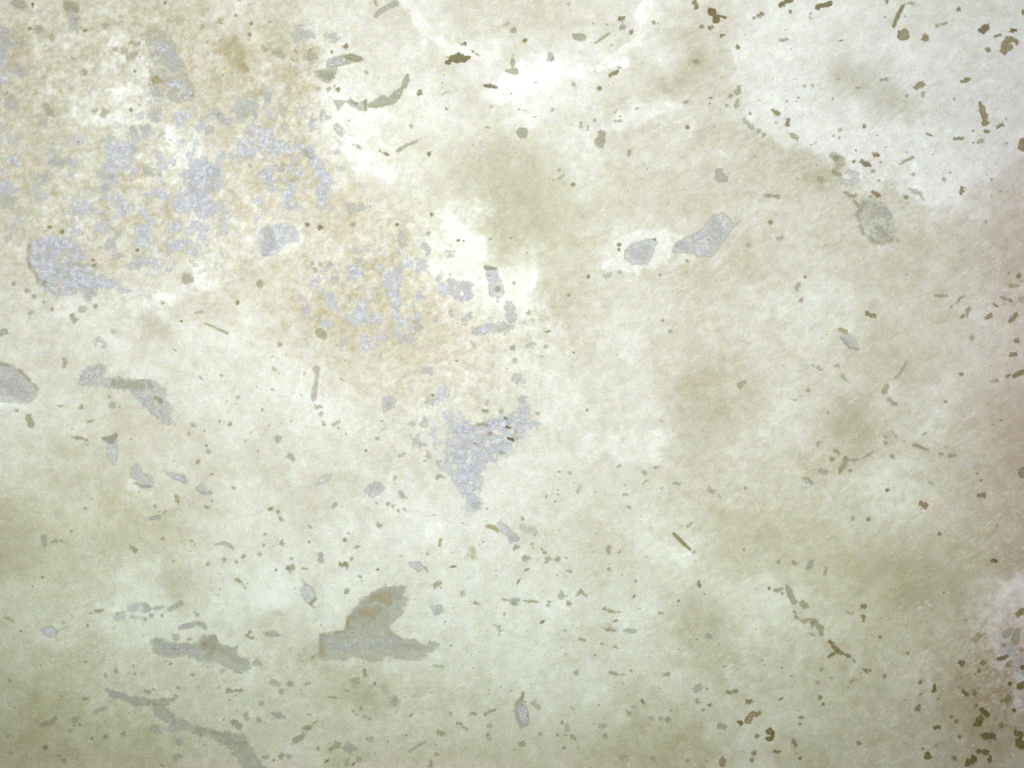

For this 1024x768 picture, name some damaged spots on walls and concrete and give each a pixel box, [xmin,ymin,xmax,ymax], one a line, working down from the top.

spalling [351,74,423,108]
spalling [13,42,344,301]
peeling [309,214,433,353]
spalling [436,265,536,350]
spalling [617,238,657,265]
spalling [672,213,740,262]
spalling [0,363,38,427]
spalling [79,363,174,425]
spalling [408,368,542,512]
spalling [153,614,250,672]